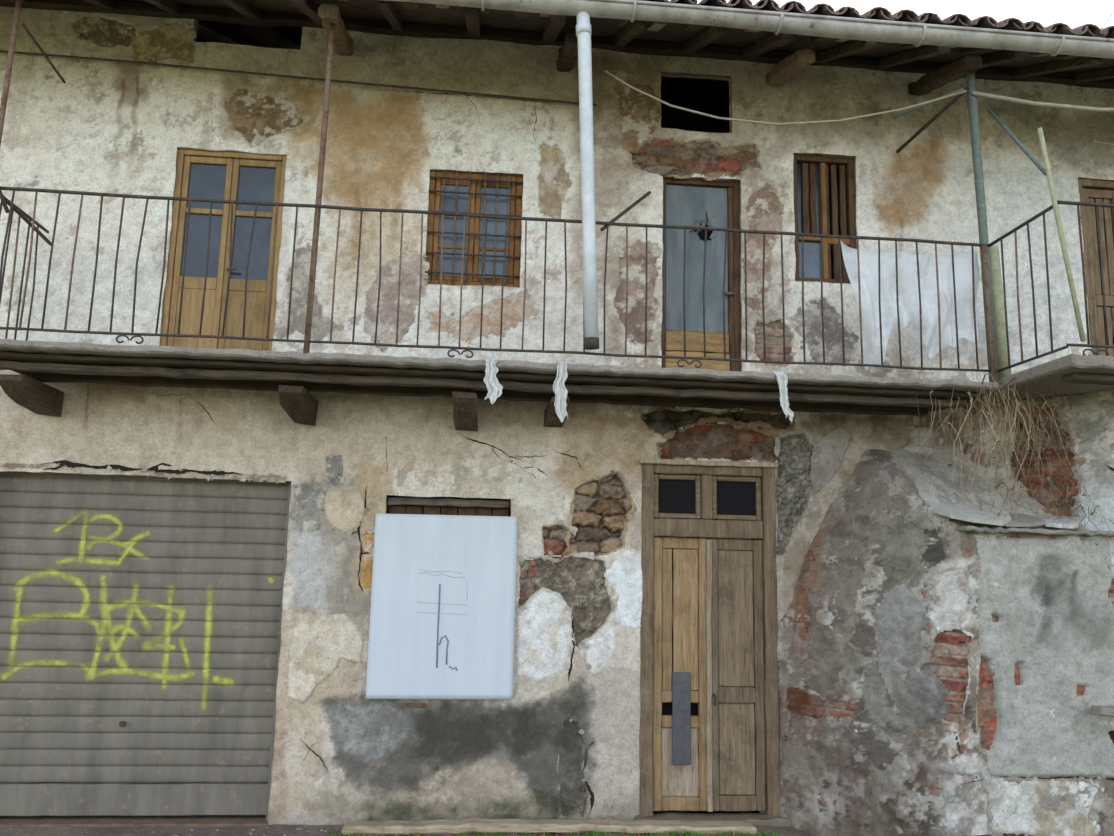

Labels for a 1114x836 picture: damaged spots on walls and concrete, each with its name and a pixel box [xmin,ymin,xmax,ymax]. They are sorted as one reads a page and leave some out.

flaking render [73,16,197,63]
flaking render [221,89,307,146]
flaking render [614,83,859,367]
crack [42,460,242,475]
crack [457,432,583,478]
flaking render [641,406,817,557]
flaking render [515,470,637,653]
flaking render [784,542,907,770]
flaking render [920,529,999,755]
flaking render [1014,663,1023,685]
damp [324,680,595,811]
flaking render [938,771,991,836]